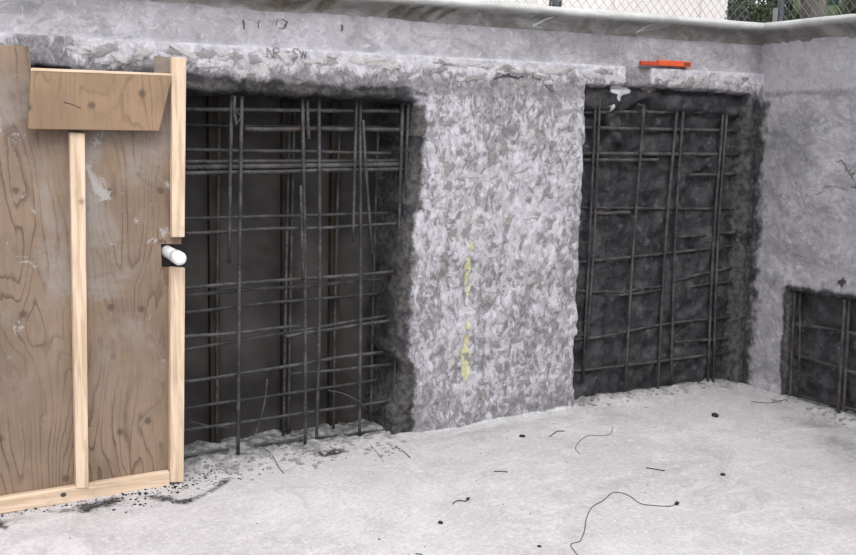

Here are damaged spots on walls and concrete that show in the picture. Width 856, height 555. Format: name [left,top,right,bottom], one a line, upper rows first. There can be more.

crack [817,159,856,195]
spalling [64,42,757,458]
spalling [788,291,856,413]